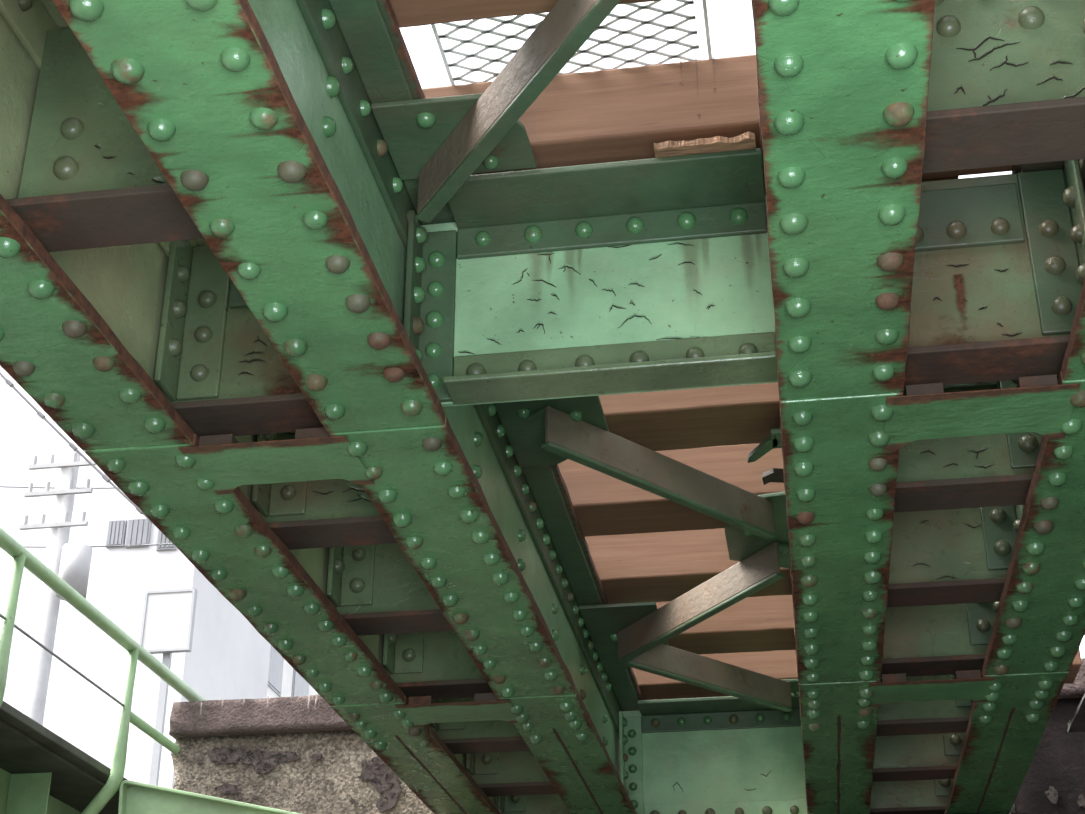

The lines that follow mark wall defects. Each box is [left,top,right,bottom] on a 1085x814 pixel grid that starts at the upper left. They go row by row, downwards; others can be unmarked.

rust [52,0,74,22]
rust [233,26,260,48]
rust [101,75,150,117]
rust [243,87,306,144]
rust [301,165,330,194]
rust [326,211,357,249]
rust [204,235,243,272]
rust [863,347,907,390]
rust [792,570,803,610]
peeling [197,746,322,774]
peeling [360,756,402,812]
rust [806,784,817,810]